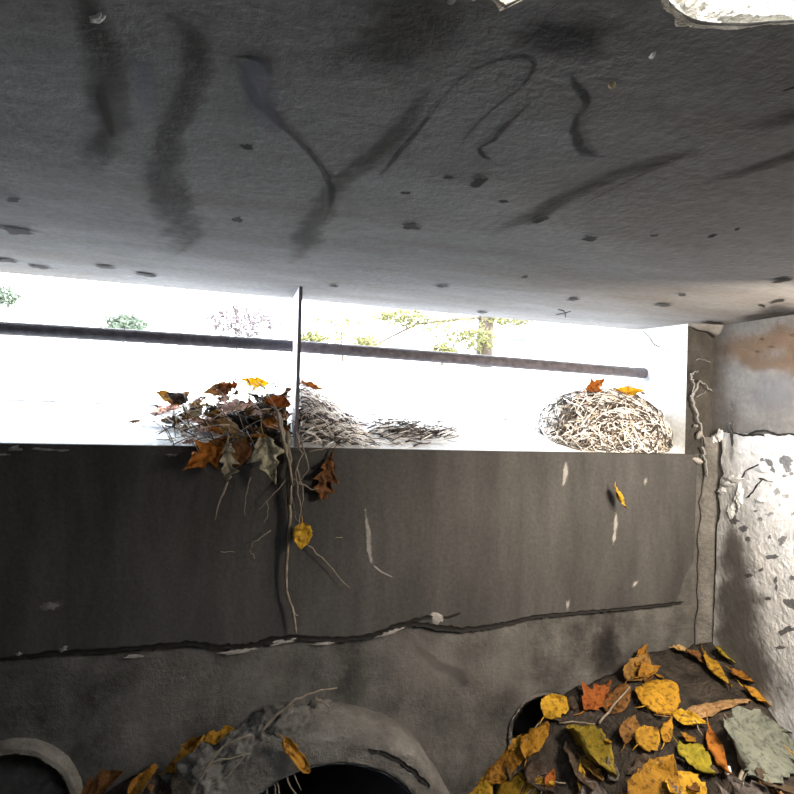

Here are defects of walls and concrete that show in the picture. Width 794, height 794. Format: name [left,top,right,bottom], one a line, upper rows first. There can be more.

spalling [492,0,522,11]
spalling [661,0,794,30]
damp [83,0,125,155]
damp [447,29,598,141]
damp [151,36,207,224]
damp [234,55,440,244]
damp [477,107,526,159]
damp [570,77,596,156]
crack [730,464,772,498]
crack [0,601,684,661]
crack [369,748,430,788]